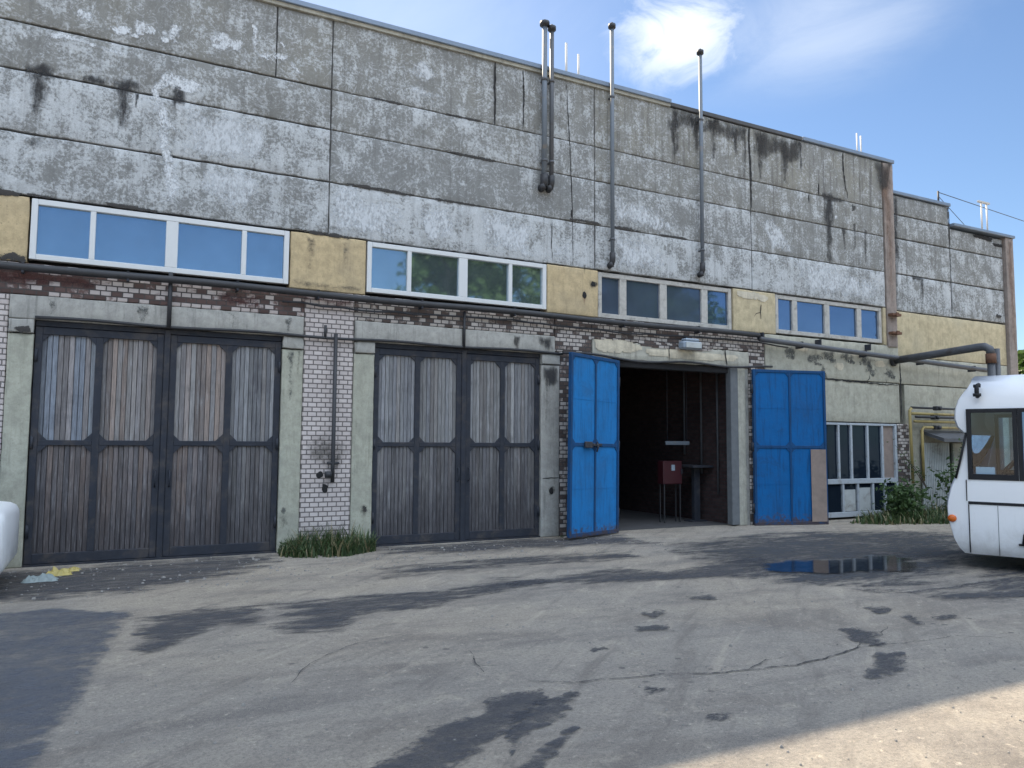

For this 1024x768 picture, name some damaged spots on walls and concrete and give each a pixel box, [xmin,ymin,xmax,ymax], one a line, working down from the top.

water stain [27,64,51,111]
water stain [120,80,139,124]
water stain [173,86,185,105]
water stain [669,110,802,180]
water stain [822,194,867,259]